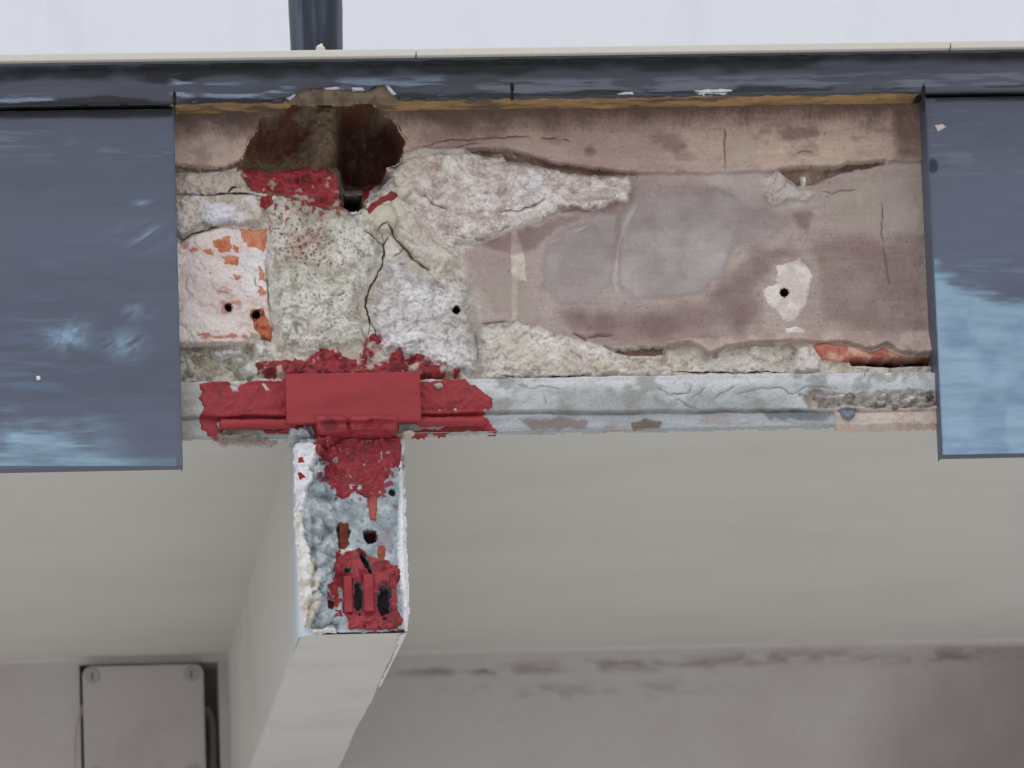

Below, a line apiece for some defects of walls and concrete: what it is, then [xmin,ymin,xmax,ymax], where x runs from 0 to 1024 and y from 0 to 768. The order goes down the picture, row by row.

crack [426,136,569,148]
crack [363,222,429,336]
spalling [173,79,1024,455]
crack [881,206,890,282]
spalling [293,437,410,687]